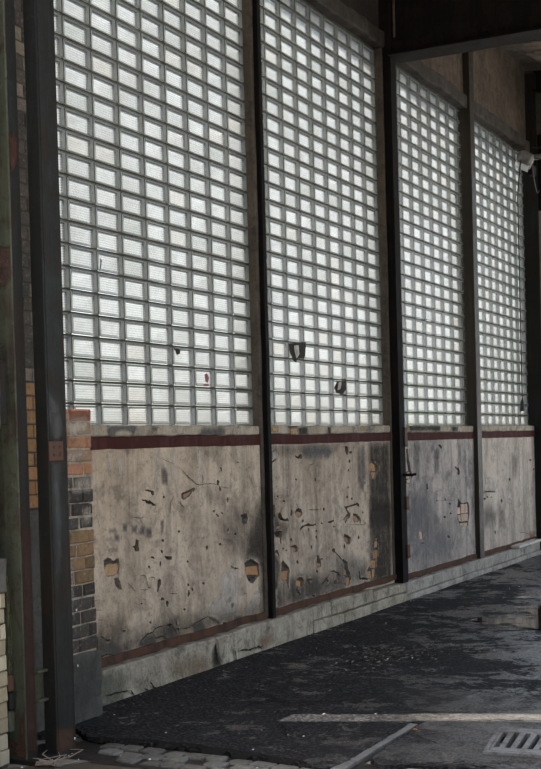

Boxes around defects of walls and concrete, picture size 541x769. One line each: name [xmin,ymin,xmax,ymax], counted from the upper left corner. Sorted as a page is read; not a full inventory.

damp [358,444,391,579]
flaking render [436,498,469,527]
flaking render [103,557,122,590]
flaking render [231,558,259,584]
flaking render [274,487,366,599]
flaking render [325,539,379,591]